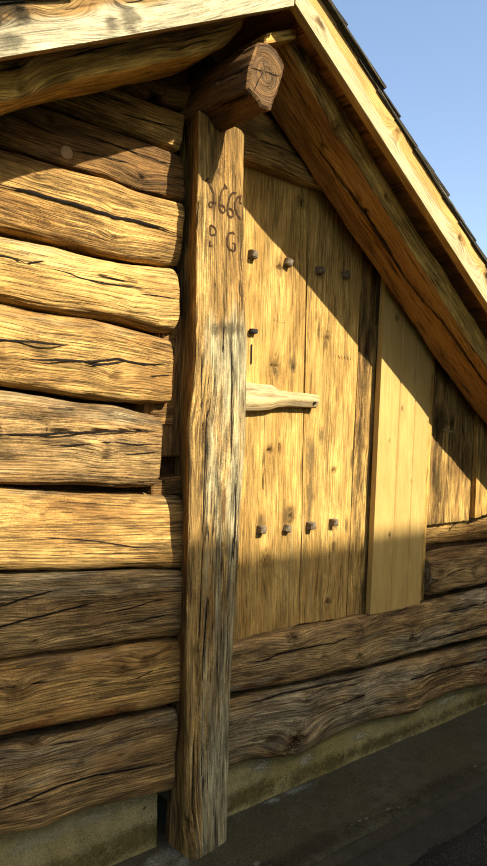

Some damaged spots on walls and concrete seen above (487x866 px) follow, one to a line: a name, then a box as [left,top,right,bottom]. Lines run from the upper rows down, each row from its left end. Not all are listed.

crack [0,339,171,377]
crack [0,763,161,810]